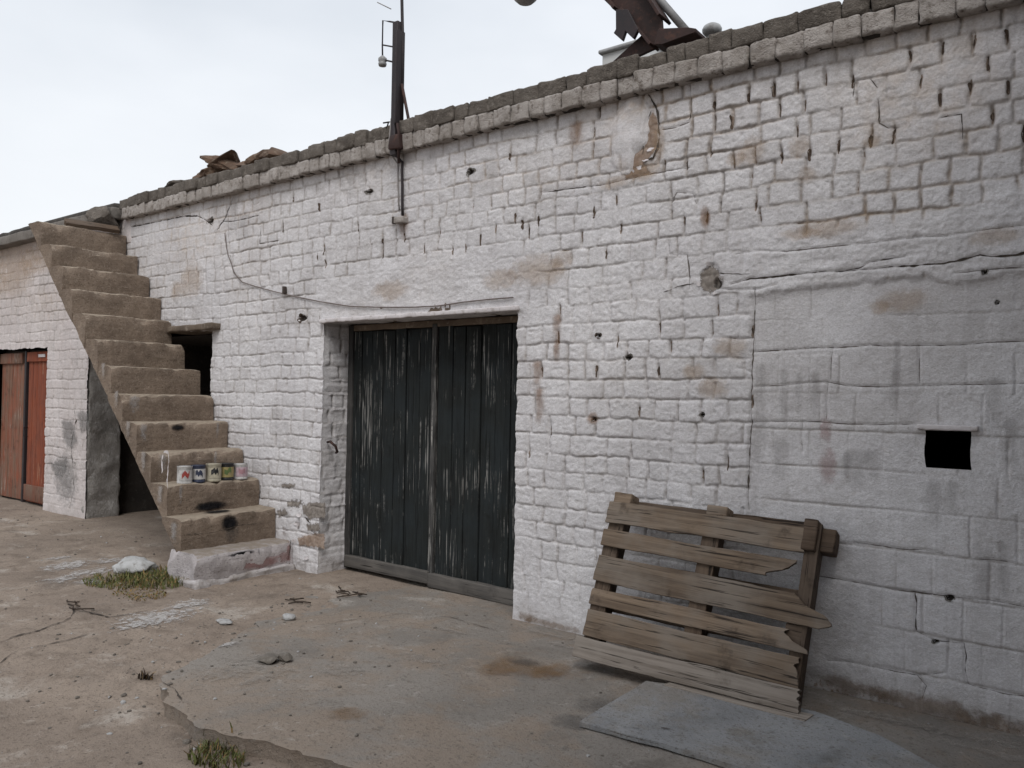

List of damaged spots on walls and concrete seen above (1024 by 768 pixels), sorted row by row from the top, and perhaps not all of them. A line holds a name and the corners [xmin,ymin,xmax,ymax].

spalling [664,262,739,306]
crack [729,225,1024,504]
peeling [277,482,326,560]